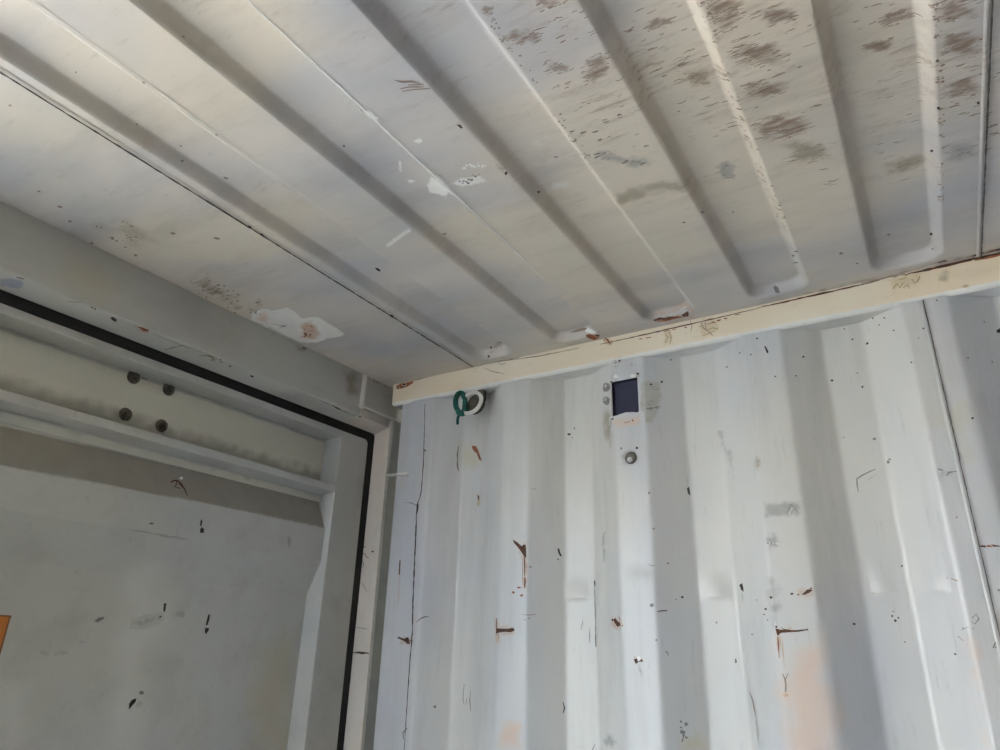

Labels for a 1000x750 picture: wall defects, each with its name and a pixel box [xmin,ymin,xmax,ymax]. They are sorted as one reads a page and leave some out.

peeling [396,158,510,203]
peeling [250,306,347,343]
rust [600,242,1000,367]
rust [790,583,820,602]